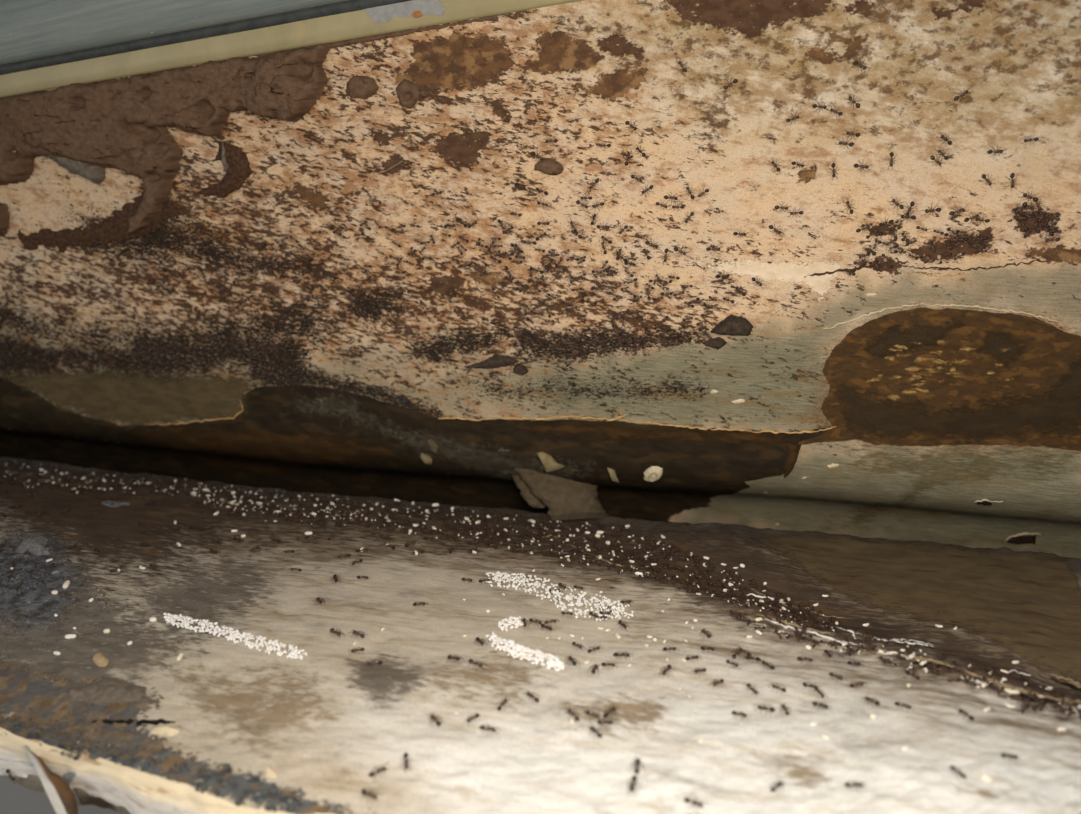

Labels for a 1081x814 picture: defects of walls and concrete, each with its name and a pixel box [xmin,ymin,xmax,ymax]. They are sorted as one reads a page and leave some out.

damp [429,269,504,296]
crack [804,260,1064,278]
damp [1,368,251,427]
damp [798,307,1081,506]
peeling [0,378,1081,814]